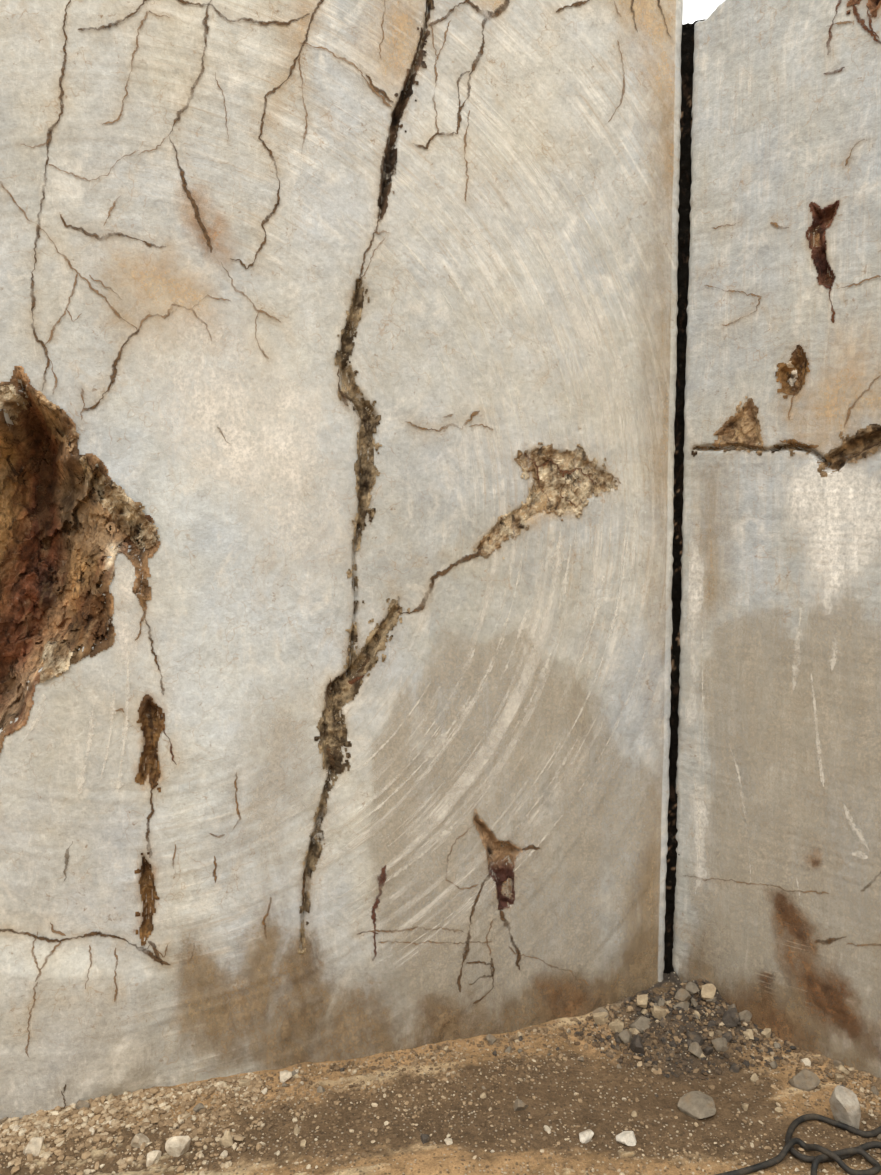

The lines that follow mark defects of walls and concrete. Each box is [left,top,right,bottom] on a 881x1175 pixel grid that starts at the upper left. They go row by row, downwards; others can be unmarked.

spalling [826,0,881,46]
peeling [173,355,317,548]
crack [2,0,509,958]
spalling [473,442,621,559]
spalling [775,345,810,419]
spalling [0,366,177,965]
leakage [333,542,661,1003]
crack [0,923,193,1057]
rust [773,893,880,1055]